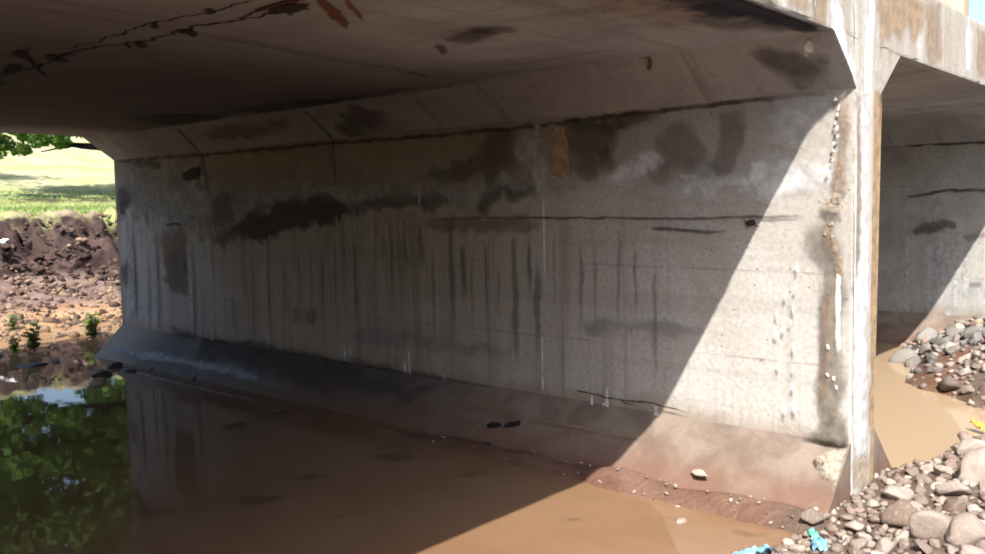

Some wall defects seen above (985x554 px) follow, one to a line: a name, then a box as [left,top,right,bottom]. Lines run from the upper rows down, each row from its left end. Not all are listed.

crack [0,0,540,86]
corrosion [317,0,363,29]
damp [449,29,508,43]
corrosion [880,0,924,40]
damp [485,125,571,272]
damp [609,152,661,183]
damp [146,230,281,353]
damp [662,0,875,492]
corrosion [869,92,882,482]
damp [925,240,969,316]